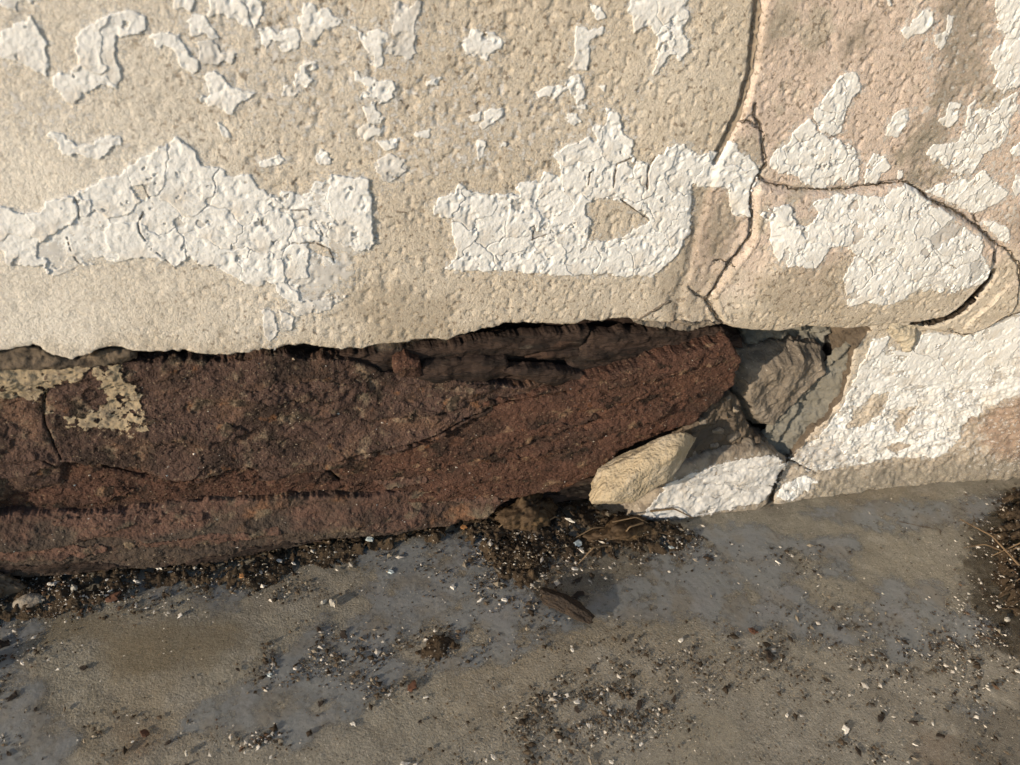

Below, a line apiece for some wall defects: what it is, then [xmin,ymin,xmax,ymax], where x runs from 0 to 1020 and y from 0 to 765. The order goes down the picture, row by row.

peeling [0,0,1020,350]
crack [688,103,1020,335]
spalling [0,344,138,370]
rust [279,343,339,353]
rust [409,317,640,342]
rust [721,323,743,348]
peeling [737,286,1020,502]
rust [125,420,245,447]
rust [607,430,672,462]
rust [540,475,595,503]
peeling [585,496,1009,664]
peeling [173,534,584,751]